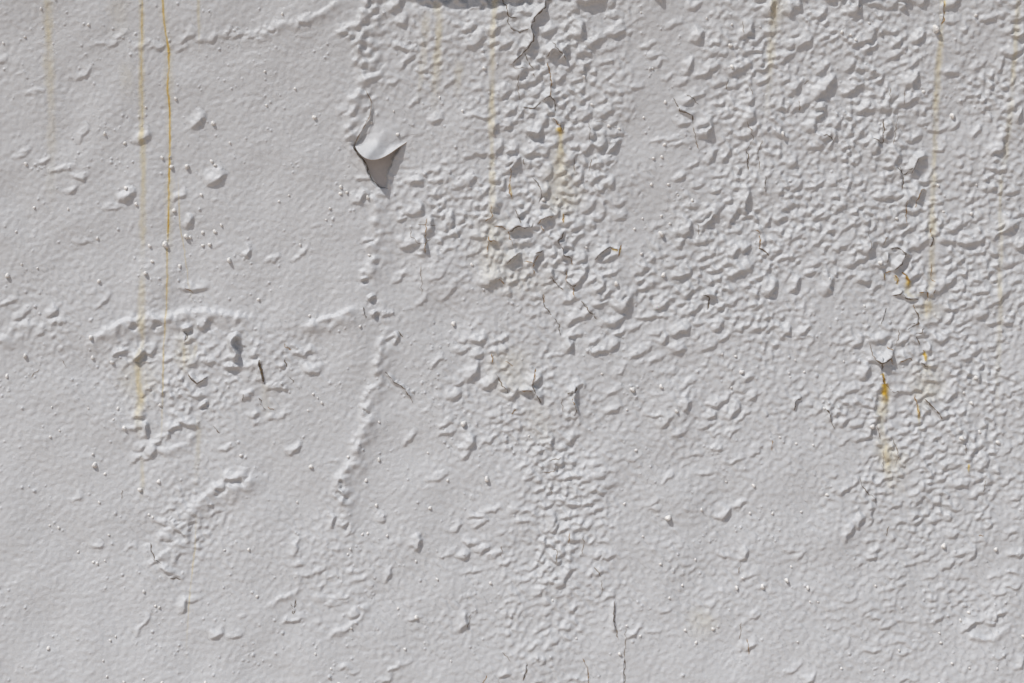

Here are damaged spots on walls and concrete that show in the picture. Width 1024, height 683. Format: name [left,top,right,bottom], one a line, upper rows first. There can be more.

peeling [353,89,417,189]
crack [502,0,600,171]
crack [486,159,621,337]
crack [868,158,945,419]